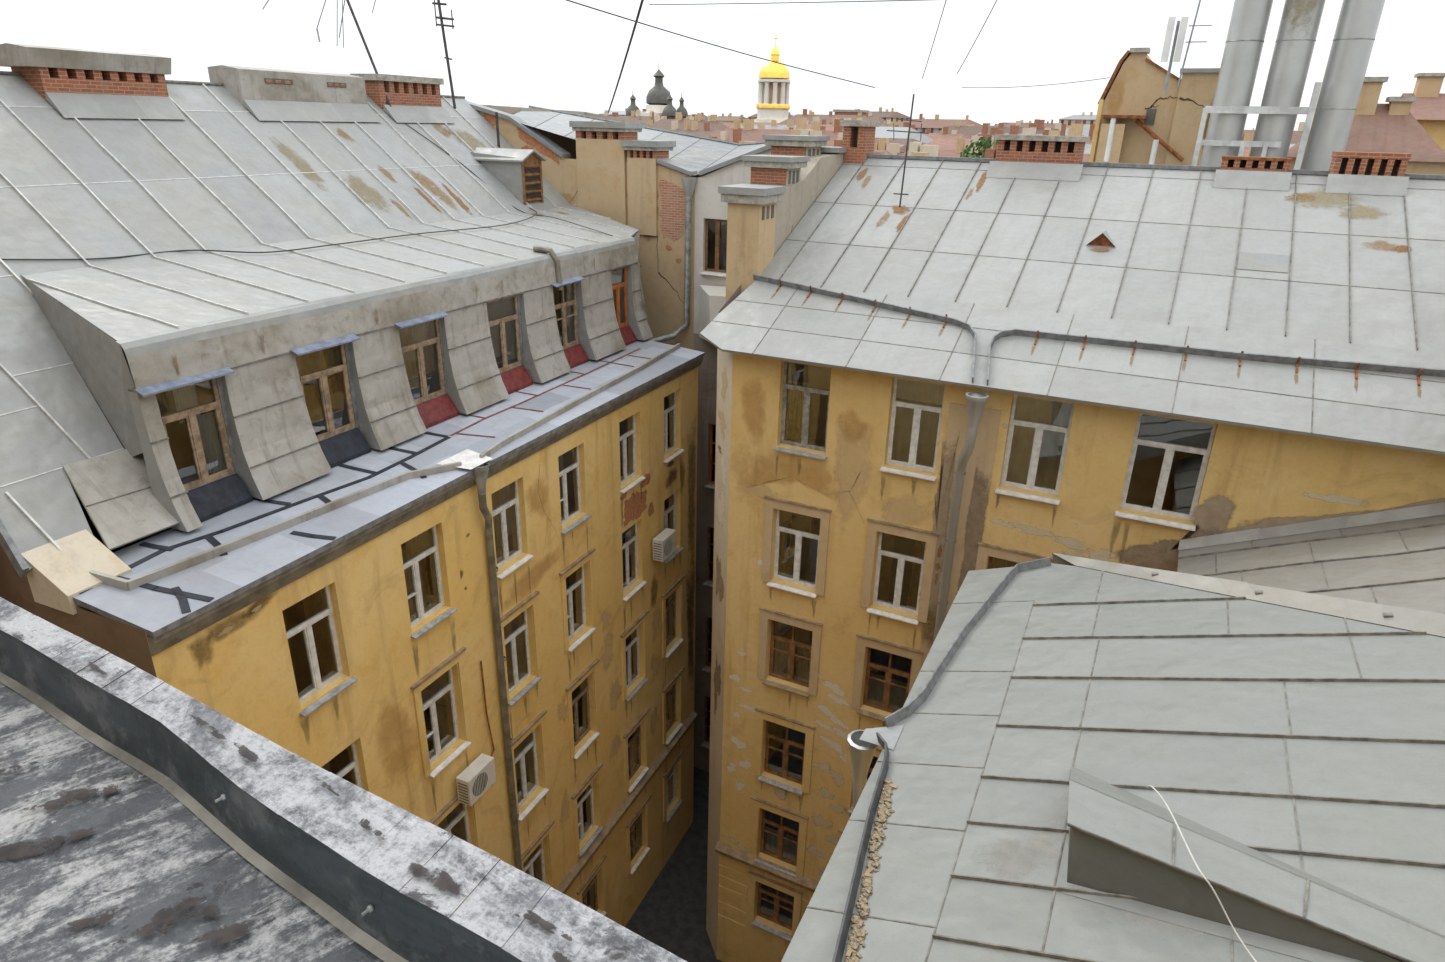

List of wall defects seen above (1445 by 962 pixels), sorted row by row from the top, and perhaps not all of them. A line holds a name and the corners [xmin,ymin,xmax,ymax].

corrosion [432,123,479,150]
corrosion [280,145,320,180]
corrosion [351,179,409,216]
corrosion [411,172,469,212]
corrosion [1291,192,1380,218]
corrosion [1373,241,1411,252]
damp [195,597,269,661]